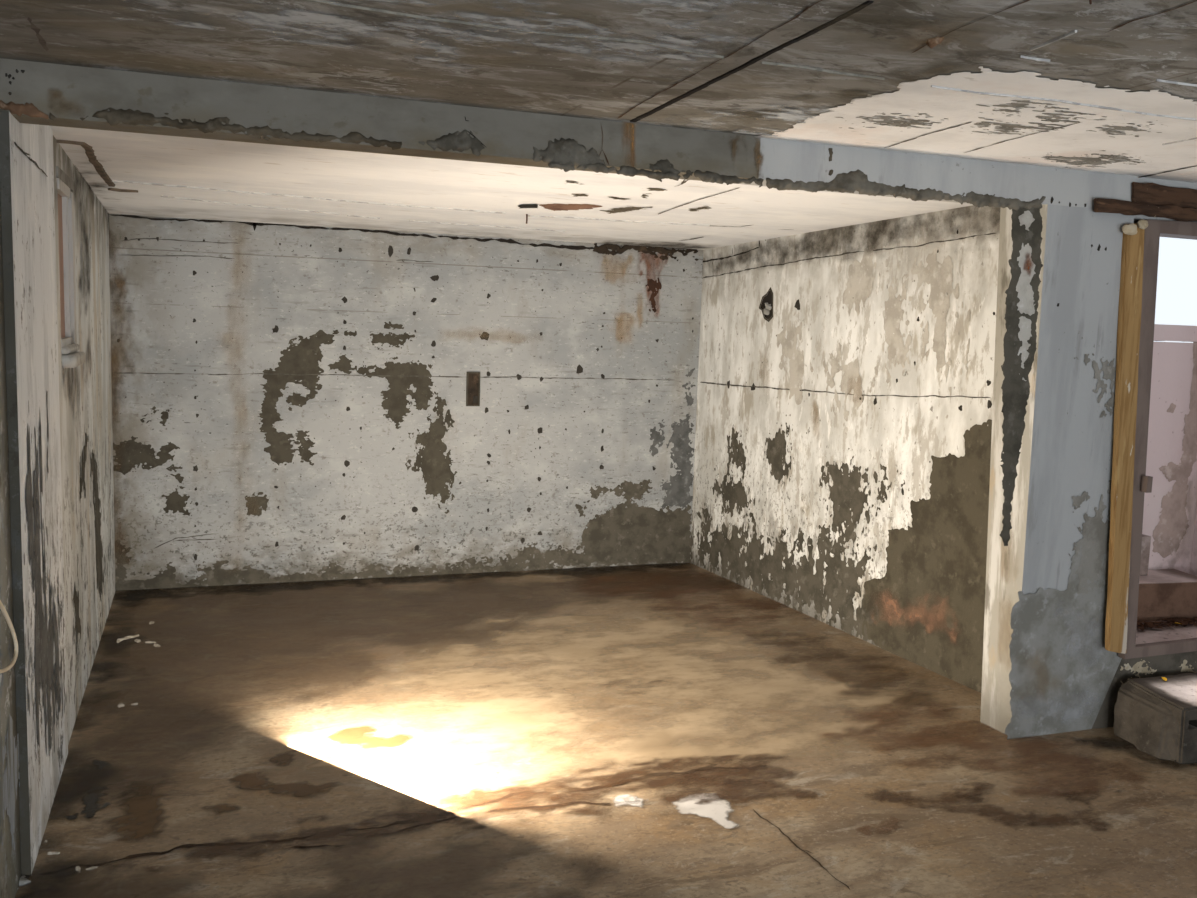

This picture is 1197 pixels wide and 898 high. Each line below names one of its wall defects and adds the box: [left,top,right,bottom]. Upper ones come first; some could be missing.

spalling [80,108,402,150]
spalling [419,130,485,156]
peeling [836,112,947,129]
peeling [972,100,1162,168]
damp [80,225,90,290]
rust [640,254,668,313]
peeling [80,138,1086,693]
peeling [1074,353,1116,418]
peeling [1005,480,1157,739]
damp [50,563,930,840]
crack [41,764,767,875]
damp [331,841,514,898]